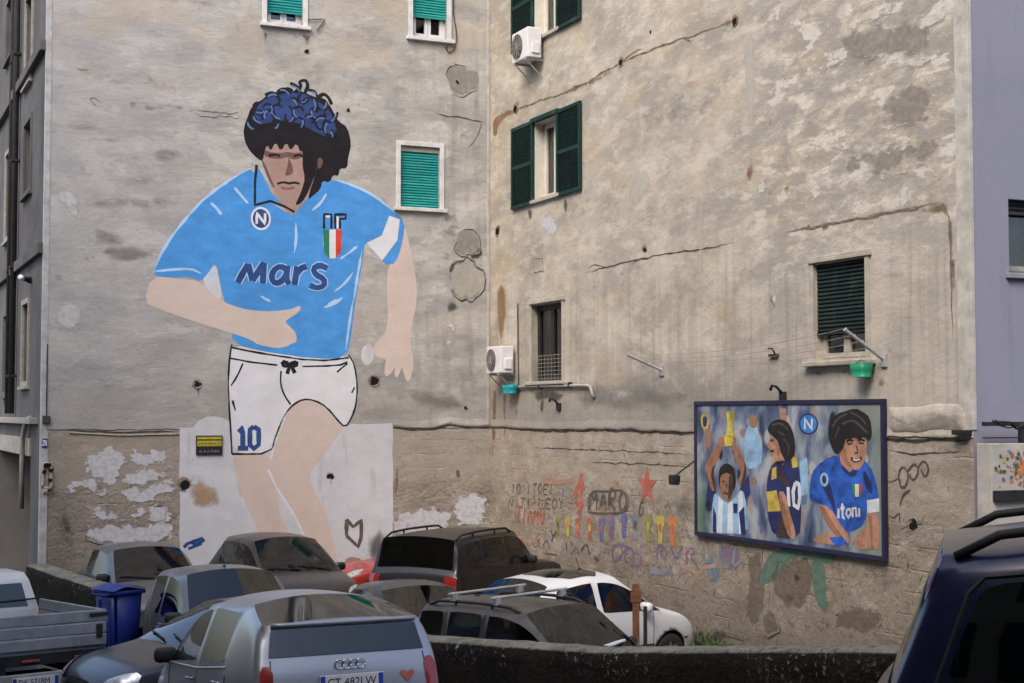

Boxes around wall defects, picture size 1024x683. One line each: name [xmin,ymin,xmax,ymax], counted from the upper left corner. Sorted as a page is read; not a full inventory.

flaking render [826,6,946,70]
crack [436,24,723,147]
flaking render [804,86,946,180]
corrosion [498,287,506,333]
crack [588,243,729,272]
crack [941,204,953,336]
peeling [67,446,175,544]
peeling [392,492,488,535]